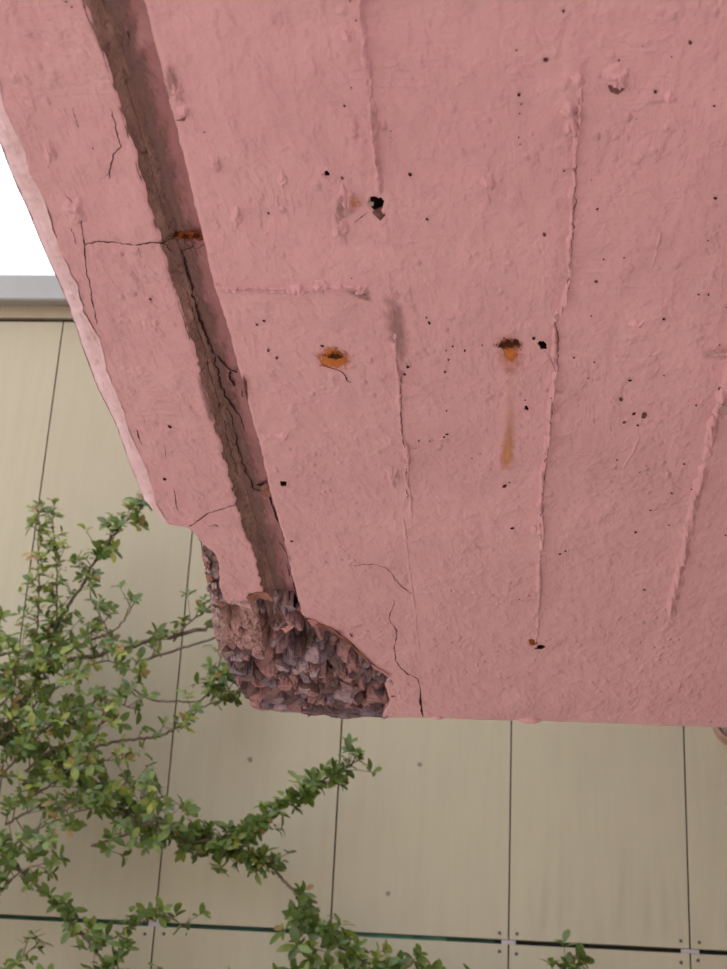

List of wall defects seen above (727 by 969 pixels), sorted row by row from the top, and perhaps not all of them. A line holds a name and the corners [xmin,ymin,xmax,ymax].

corrosion [173,231,204,241]
crack [71,73,302,609]
corrosion [317,347,349,368]
corrosion [495,339,522,362]
spalling [198,538,395,719]
crack [355,564,423,716]